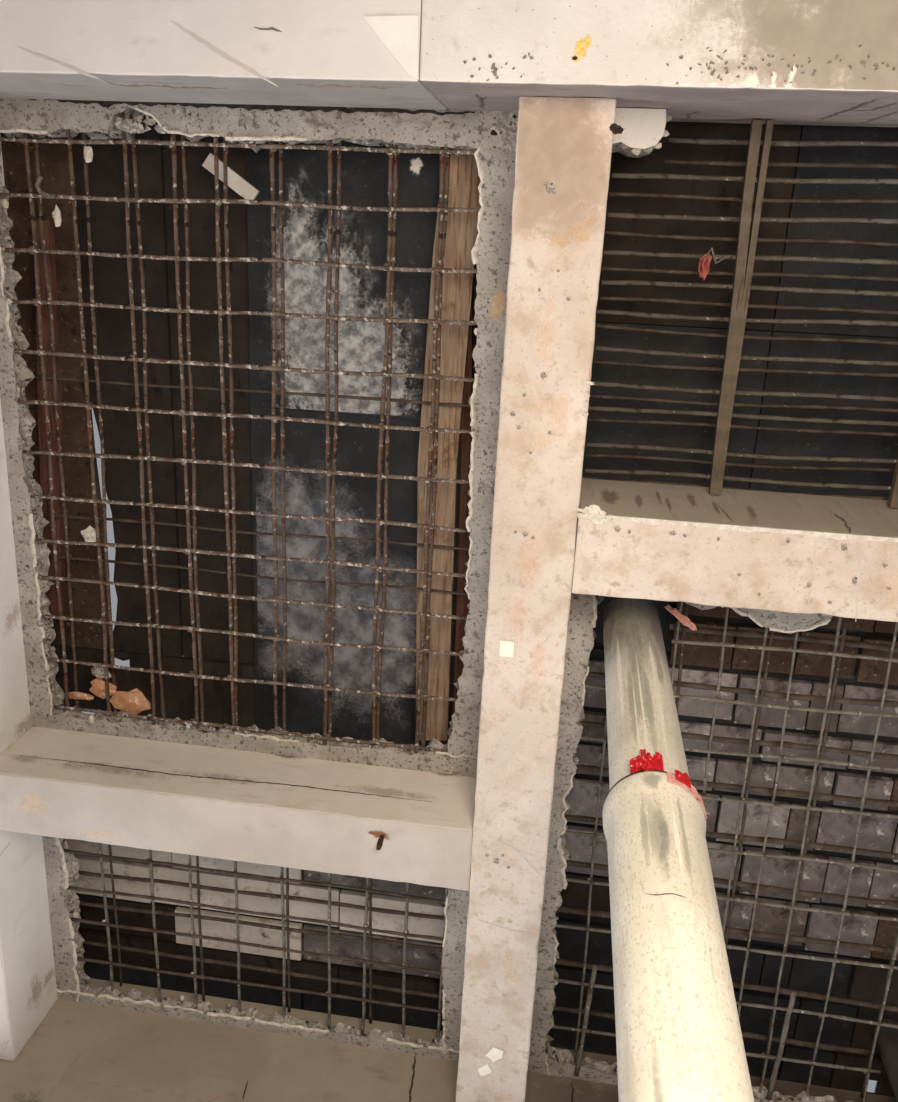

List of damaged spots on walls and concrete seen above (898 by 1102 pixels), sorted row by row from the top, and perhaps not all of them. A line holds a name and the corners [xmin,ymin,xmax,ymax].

spalling [609,108,898,184]
spalling [608,213,898,224]
spalling [596,250,736,338]
spalling [750,255,898,297]
spalling [743,304,898,345]
spalling [739,355,898,377]
spalling [578,381,720,427]
spalling [730,390,898,437]
spalling [584,443,897,500]
spalling [527,592,618,1085]
spalling [670,601,898,1102]
spalling [42,836,470,1061]